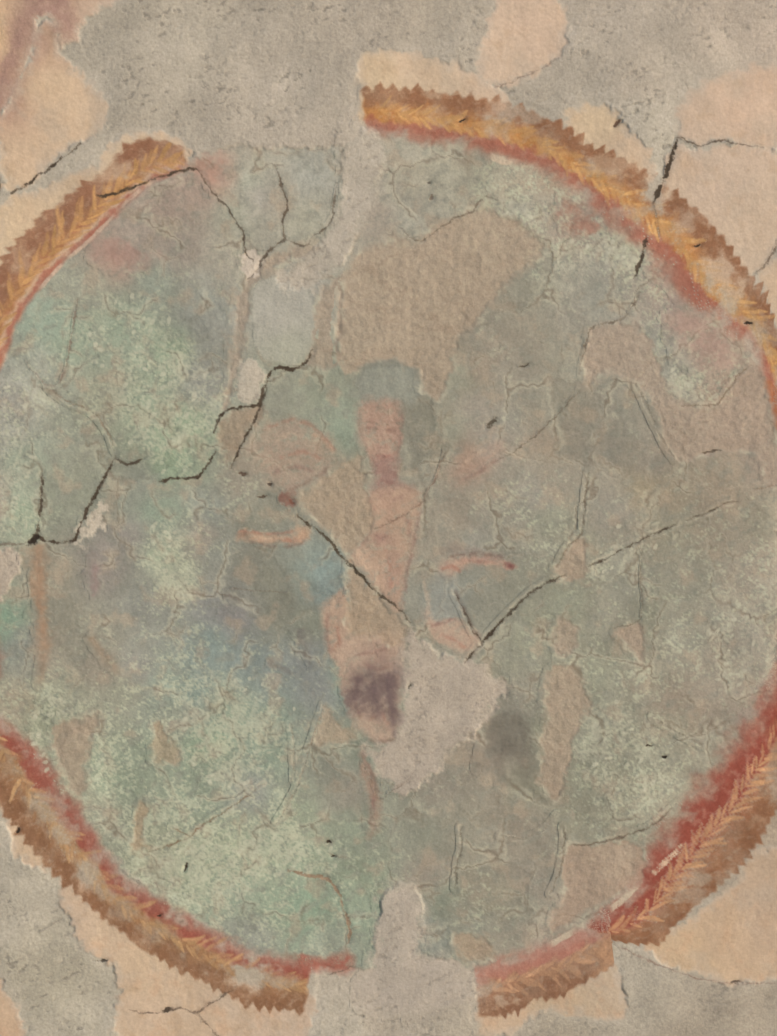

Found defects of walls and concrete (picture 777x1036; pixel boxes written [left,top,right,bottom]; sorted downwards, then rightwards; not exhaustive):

crack [0,142,82,195]
crack [94,163,339,280]
crack [398,195,497,243]
crack [496,136,765,462]
crack [0,298,144,547]
crack [158,348,314,484]
spalling [25,532,41,547]
crack [296,514,412,624]
crack [374,447,444,530]
crack [448,484,777,668]
crack [128,986,236,1036]